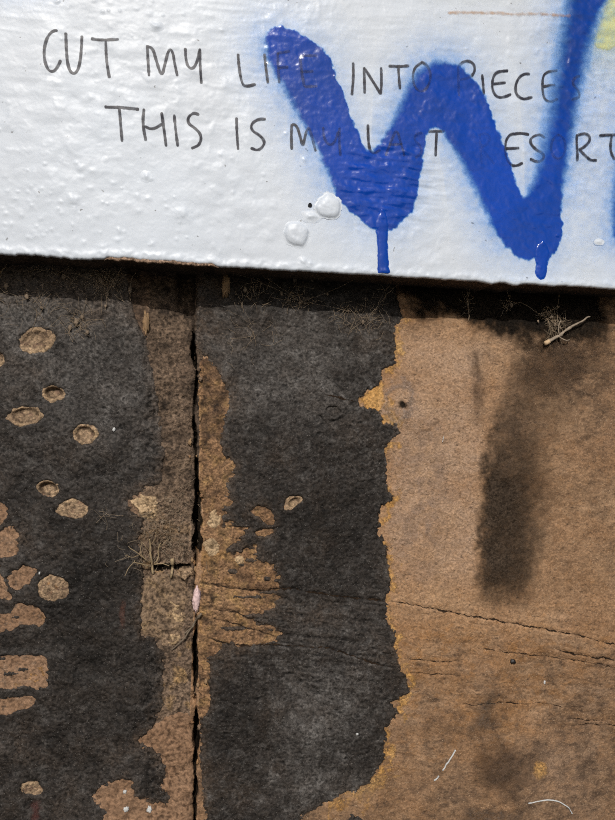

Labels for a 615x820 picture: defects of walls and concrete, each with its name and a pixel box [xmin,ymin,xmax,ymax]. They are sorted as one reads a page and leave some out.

spalling [73,424,99,445]
peeling [0,503,19,558]
spalling [36,480,88,519]
water stain [476,361,542,599]
peeling [0,565,69,632]
spalling [92,358,281,820]
crack [153,330,615,820]
peeling [0,655,48,715]